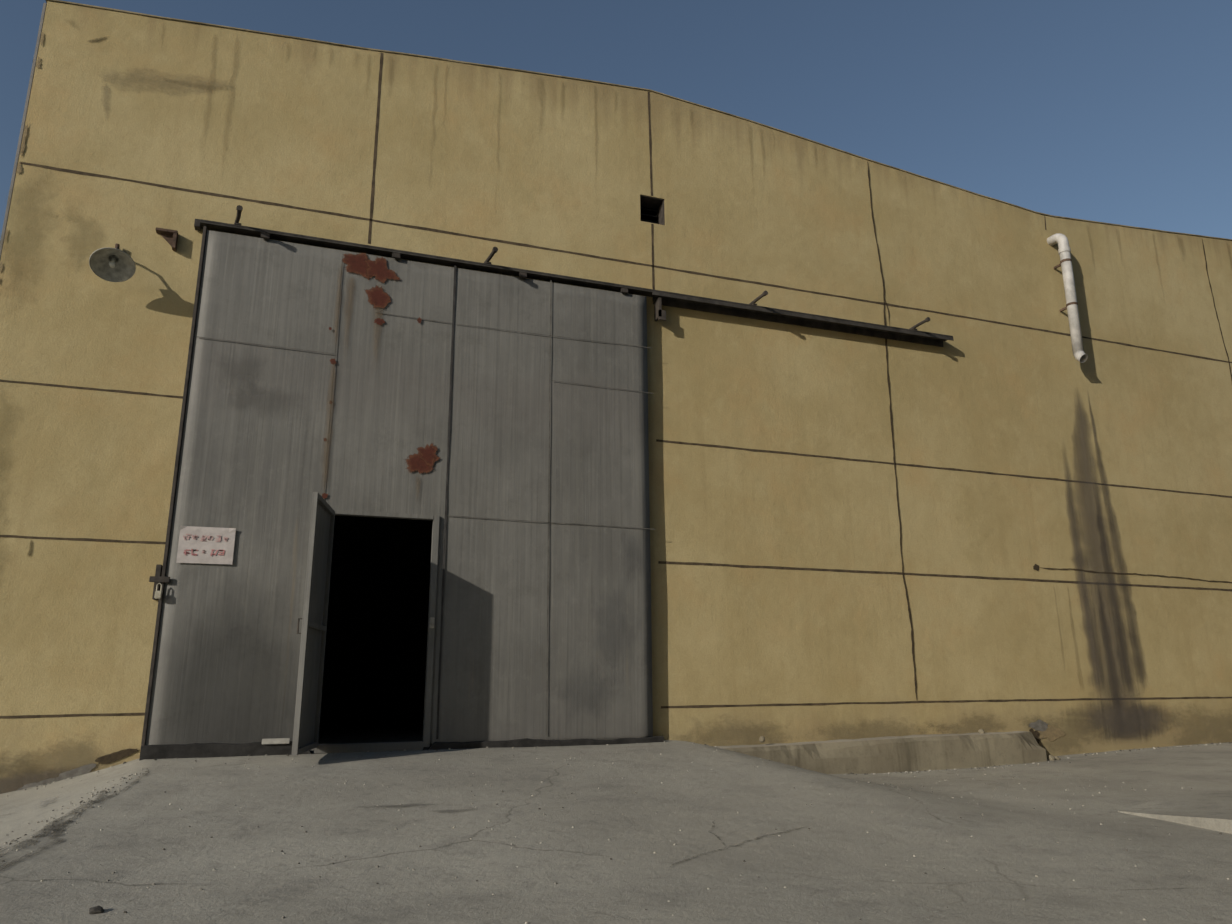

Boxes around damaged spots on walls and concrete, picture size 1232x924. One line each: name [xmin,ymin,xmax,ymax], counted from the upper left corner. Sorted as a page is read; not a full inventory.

corrosion [342,253,400,325]
corrosion [405,443,440,474]
damp [1068,409,1163,737]